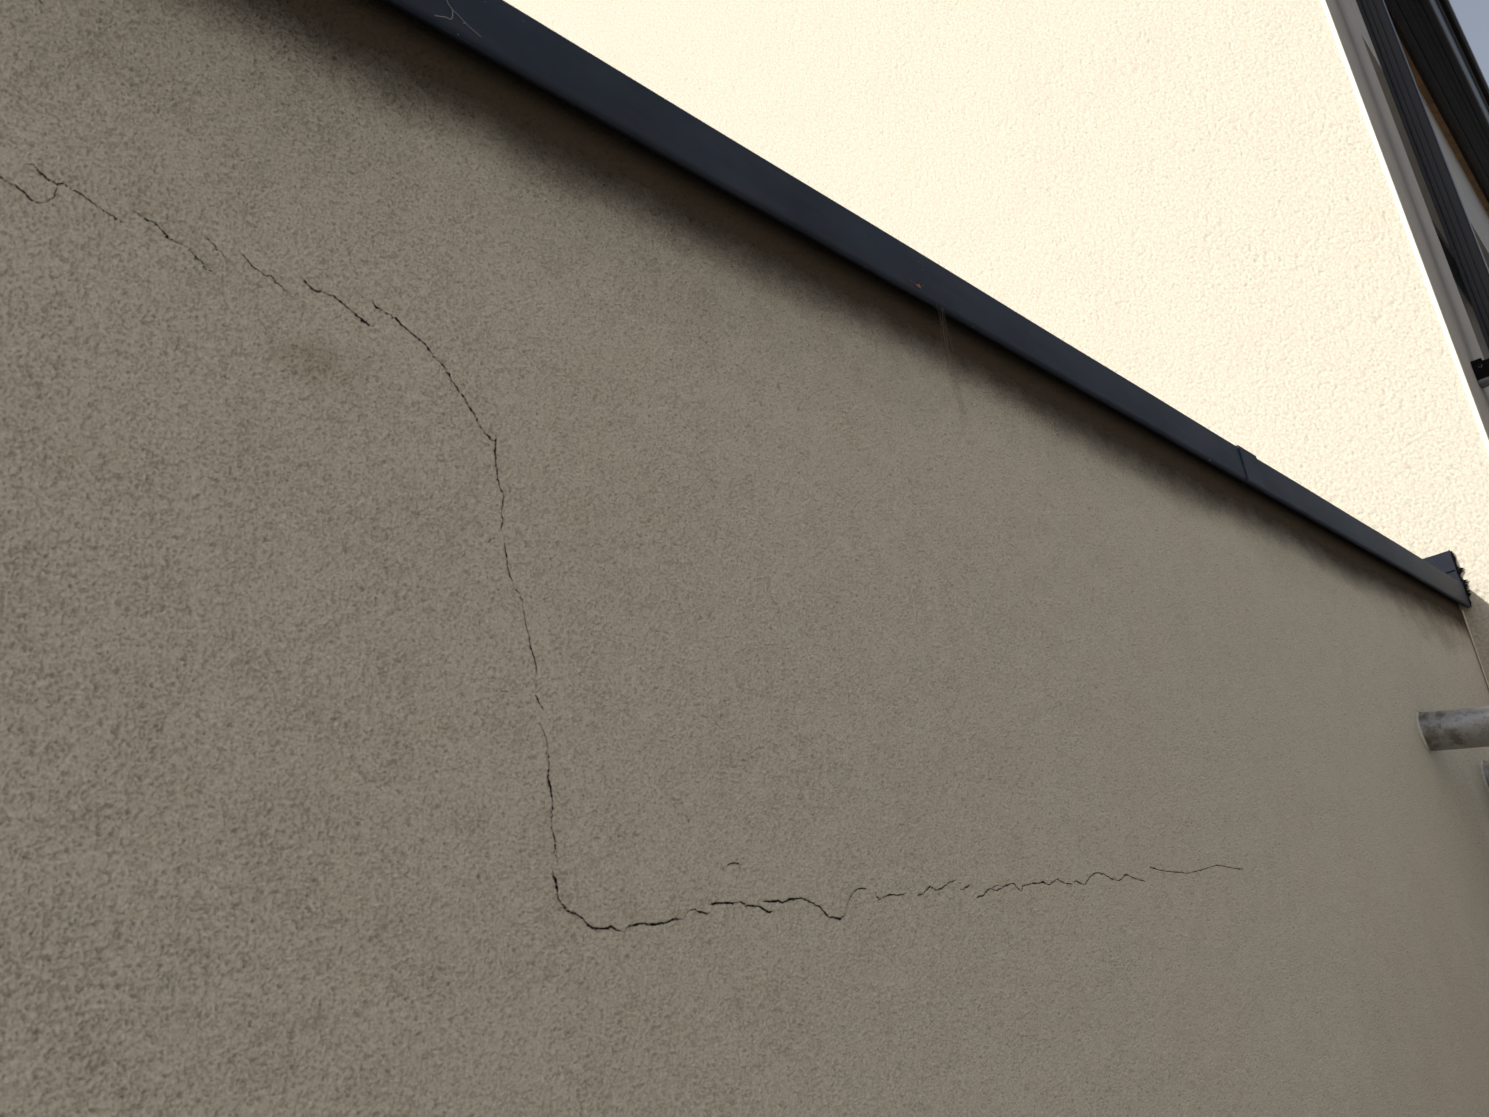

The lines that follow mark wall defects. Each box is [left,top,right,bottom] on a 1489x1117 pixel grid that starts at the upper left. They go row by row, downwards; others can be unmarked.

crack [0,164,1244,933]